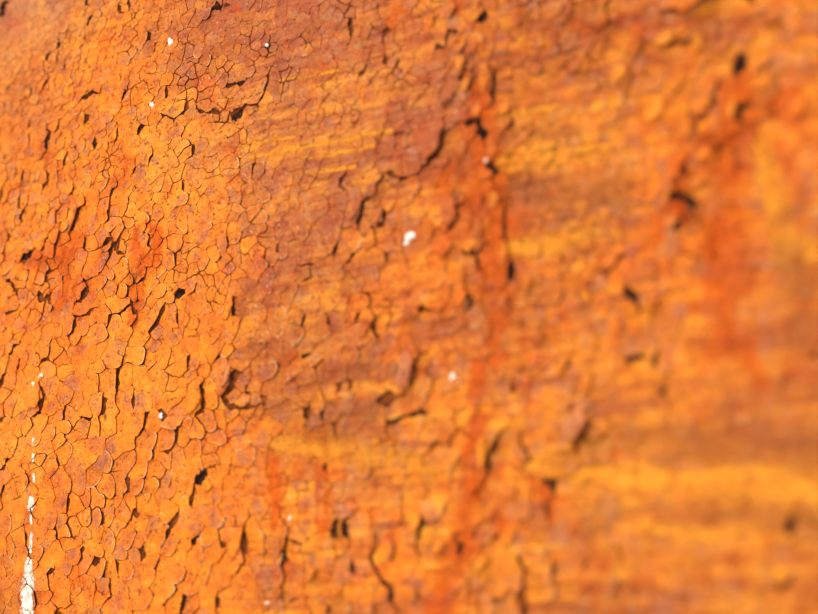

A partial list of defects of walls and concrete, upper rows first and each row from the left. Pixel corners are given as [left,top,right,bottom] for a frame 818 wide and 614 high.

peeling [414,63,516,166]
crack [129,0,818,248]
peeling [22,373,65,424]
peeling [0,146,154,315]
peeling [78,368,120,421]
peeling [130,344,252,453]
crack [0,0,560,614]
peeling [403,192,483,313]
peeling [407,414,498,480]
corrosion [462,84,513,467]
crack [235,89,818,614]
peeling [191,525,250,575]